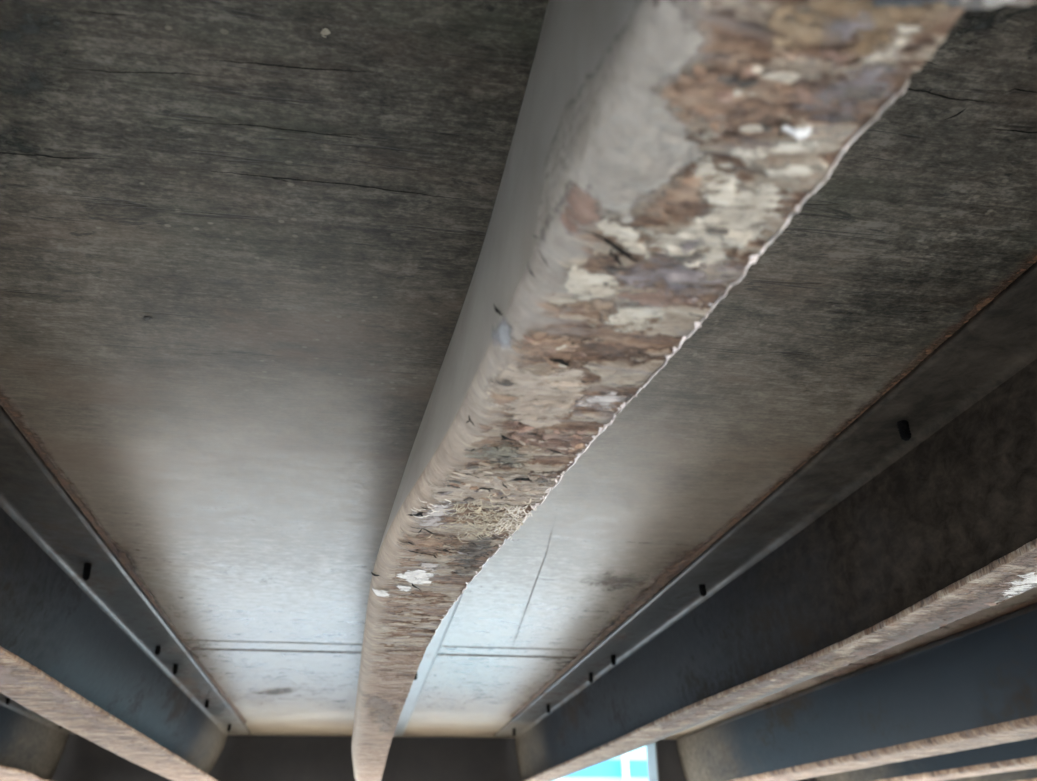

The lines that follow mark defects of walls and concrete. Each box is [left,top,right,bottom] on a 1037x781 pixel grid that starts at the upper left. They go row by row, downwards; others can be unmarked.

crack [61,59,369,77]
crack [906,61,1037,120]
crack [178,122,397,143]
crack [0,151,106,159]
crack [183,167,484,202]
peeling [428,0,909,646]
peeling [372,563,440,597]
peeling [654,548,1037,730]